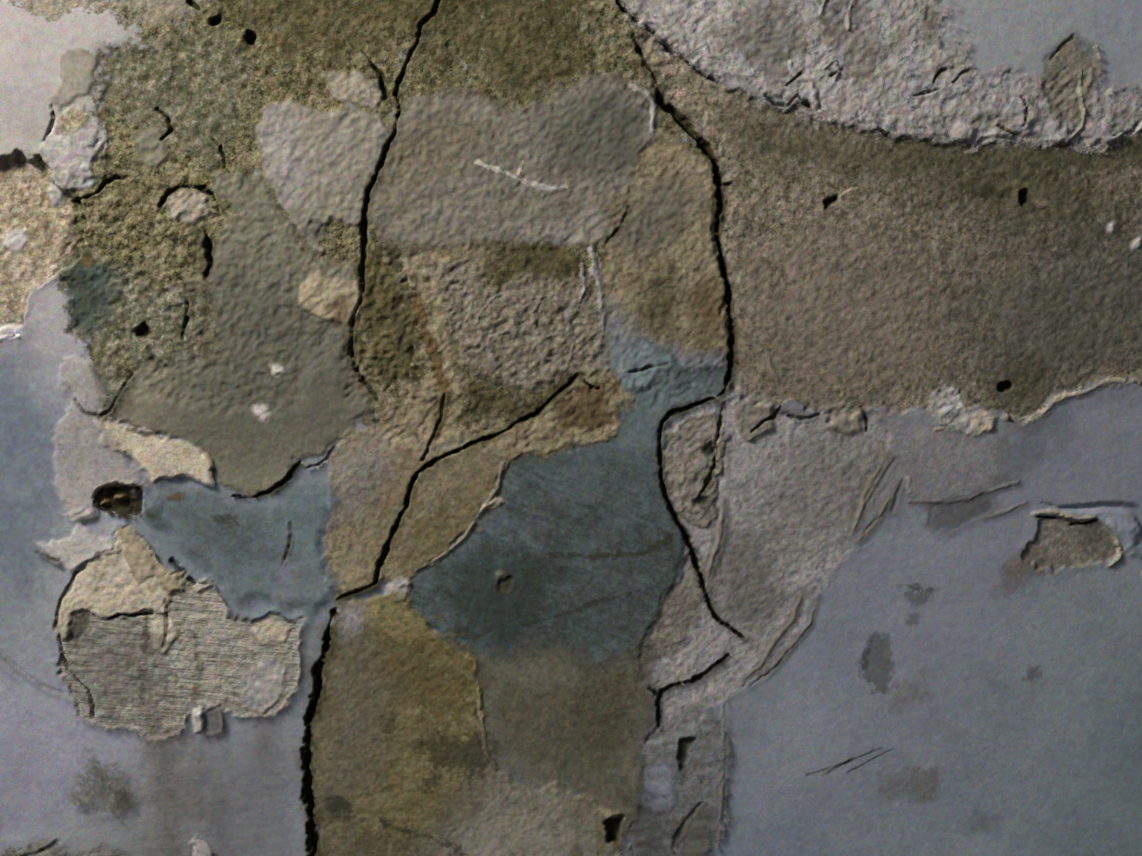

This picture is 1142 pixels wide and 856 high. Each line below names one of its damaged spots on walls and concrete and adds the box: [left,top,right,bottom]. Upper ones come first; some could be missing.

crack [350,0,441,400]
spalling [0,0,1142,675]
crack [616,0,742,729]
spalling [2,839,61,856]
spalling [36,524,304,739]
peeling [189,838,211,856]
crack [300,374,599,856]
peeling [598,810,623,819]
spalling [614,394,1007,856]